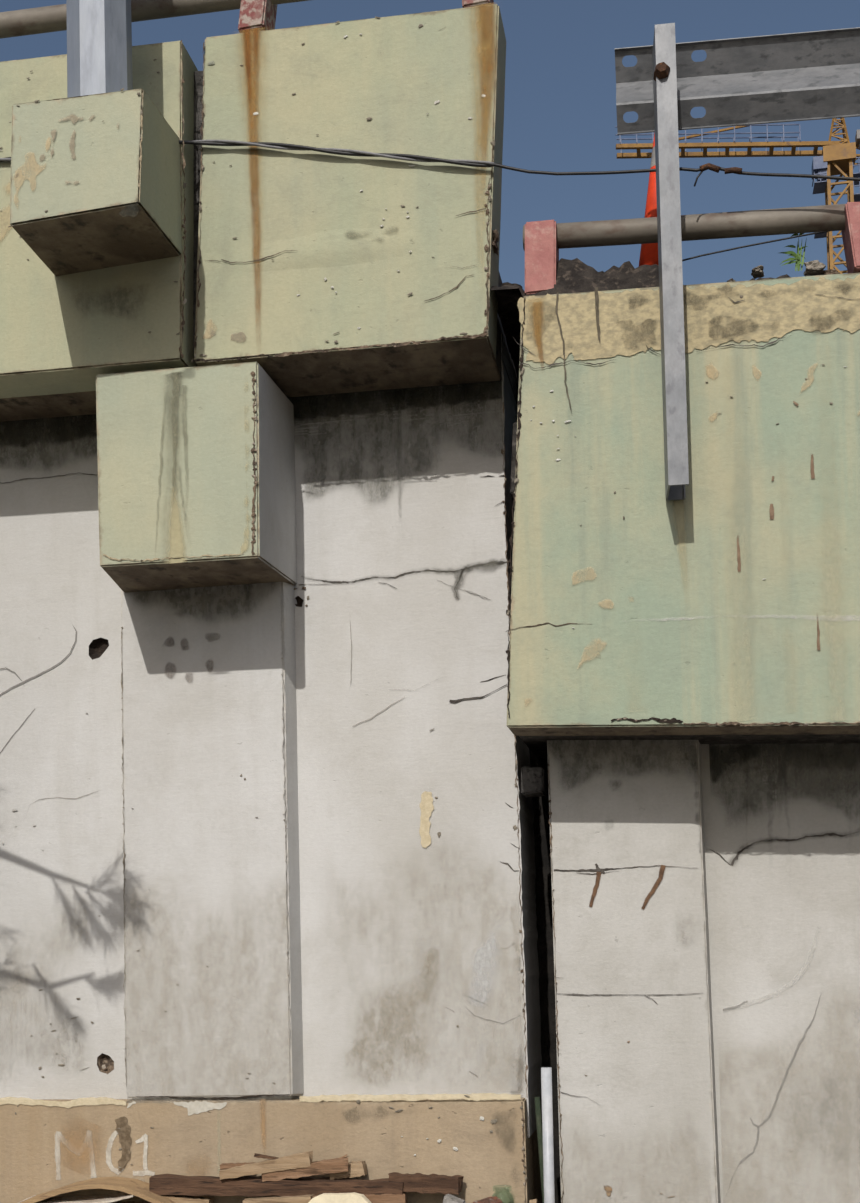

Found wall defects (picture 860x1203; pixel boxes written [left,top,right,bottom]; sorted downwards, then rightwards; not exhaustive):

rust [244,28,259,259]
spalling [683,274,860,353]
leakage [0,414,97,467]
leakage [169,372,187,564]
leakage [288,375,503,497]
spalling [501,288,661,718]
crack [301,561,507,600]
spalling [89,627,139,1018]
rust [589,871,601,907]
crack [554,863,686,875]
rust [641,865,666,909]
crack [710,831,859,866]